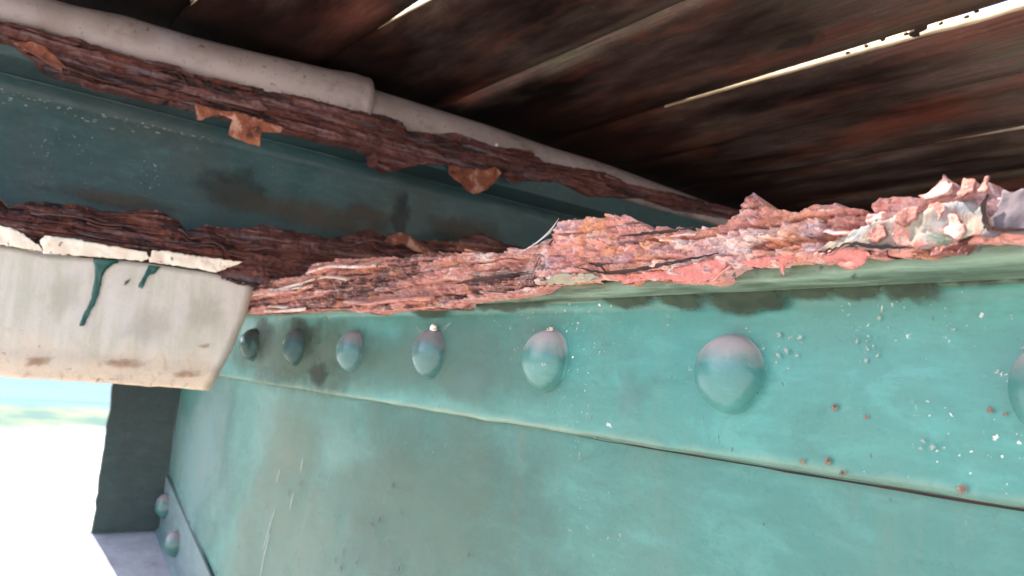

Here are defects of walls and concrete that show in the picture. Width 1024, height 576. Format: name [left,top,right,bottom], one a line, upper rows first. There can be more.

corrosion [13,41,65,71]
corrosion [195,103,284,146]
corrosion [448,165,526,194]
corrosion [376,233,490,258]
corrosion [534,192,891,290]
peeling [818,174,1024,279]